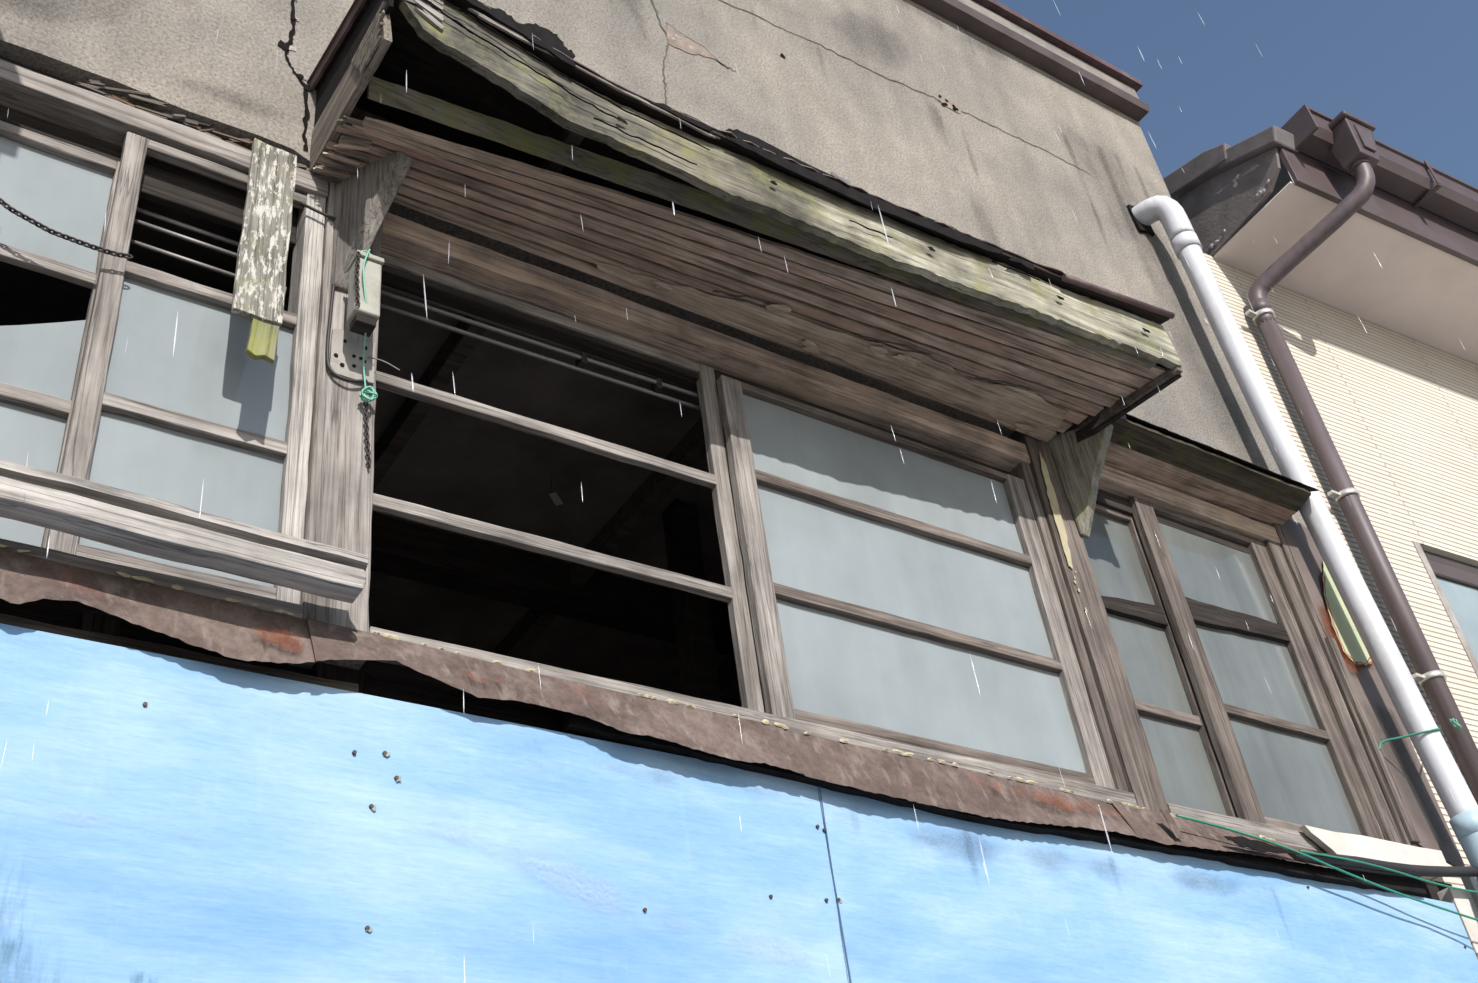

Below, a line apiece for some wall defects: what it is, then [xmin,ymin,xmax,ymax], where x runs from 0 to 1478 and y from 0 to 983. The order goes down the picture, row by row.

crack [277,0,316,151]
crack [651,0,736,105]
crack [721,0,1091,175]